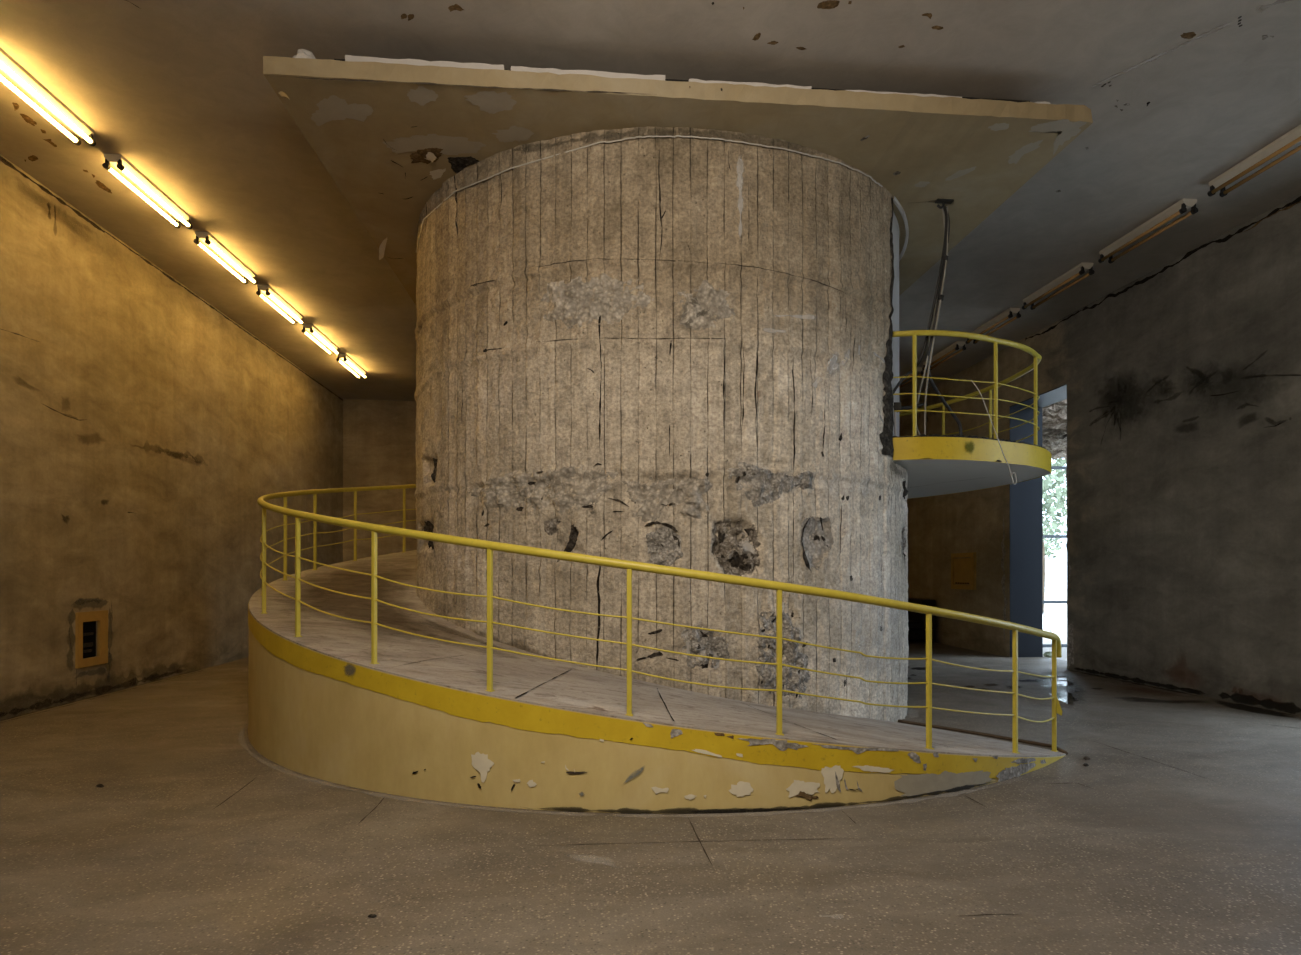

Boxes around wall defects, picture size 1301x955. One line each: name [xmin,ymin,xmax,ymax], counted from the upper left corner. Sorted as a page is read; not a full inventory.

spalling [879,197,895,457]
spalling [463,462,815,576]
spalling [800,516,834,571]
spalling [755,605,810,699]
peeling [471,752,494,783]
peeling [693,733,1046,801]